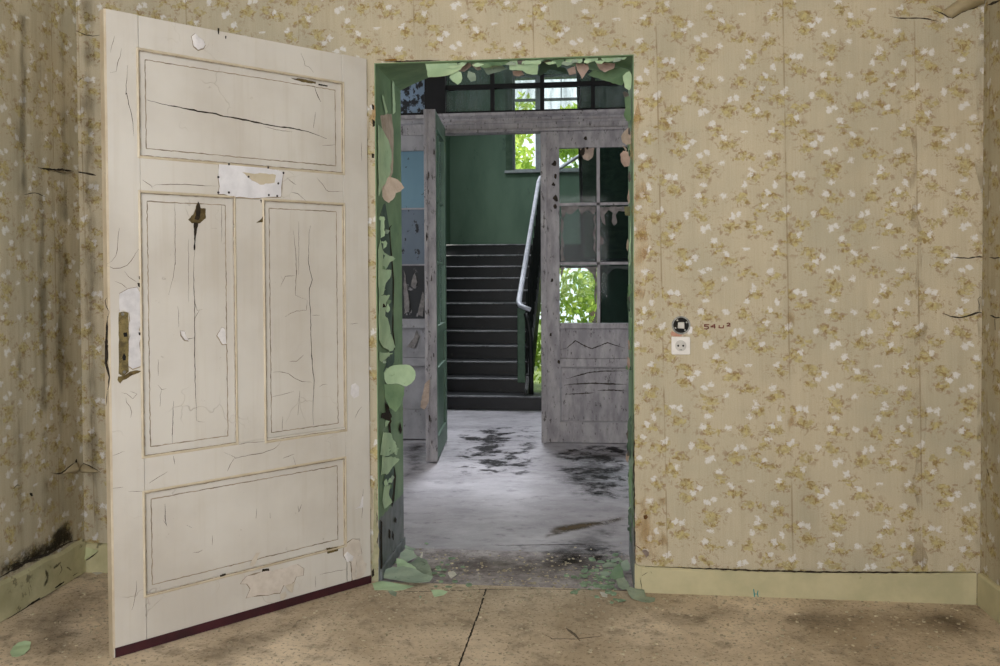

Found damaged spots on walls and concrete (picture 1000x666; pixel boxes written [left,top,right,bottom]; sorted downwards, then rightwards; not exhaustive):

peeling [426,57,632,266]
peeling [326,80,431,588]
leakage [461,428,532,475]
leakage [559,446,626,497]
leakage [2,524,72,573]
crack [408,589,501,666]